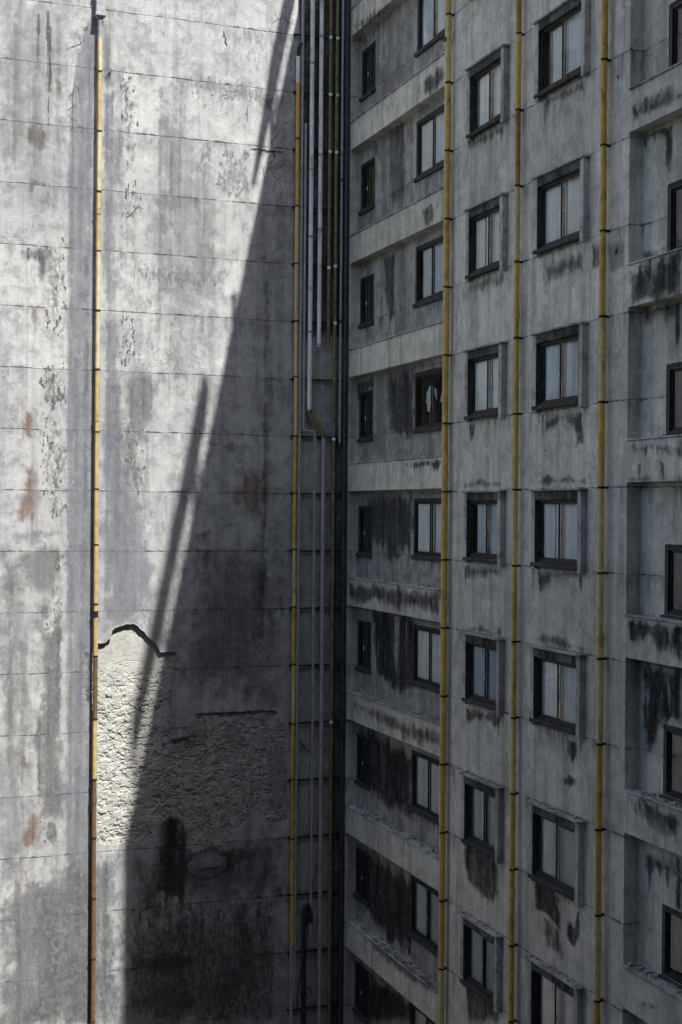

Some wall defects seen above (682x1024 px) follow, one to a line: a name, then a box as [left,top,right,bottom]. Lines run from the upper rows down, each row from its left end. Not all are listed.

water stain [632,250,681,342]
corrosion [19,470,35,519]
spalling [82,622,288,849]
water stain [332,436,440,887]
water stain [629,620,682,749]
corrosion [25,818,37,846]
water stain [147,818,280,906]
water stain [356,844,429,987]